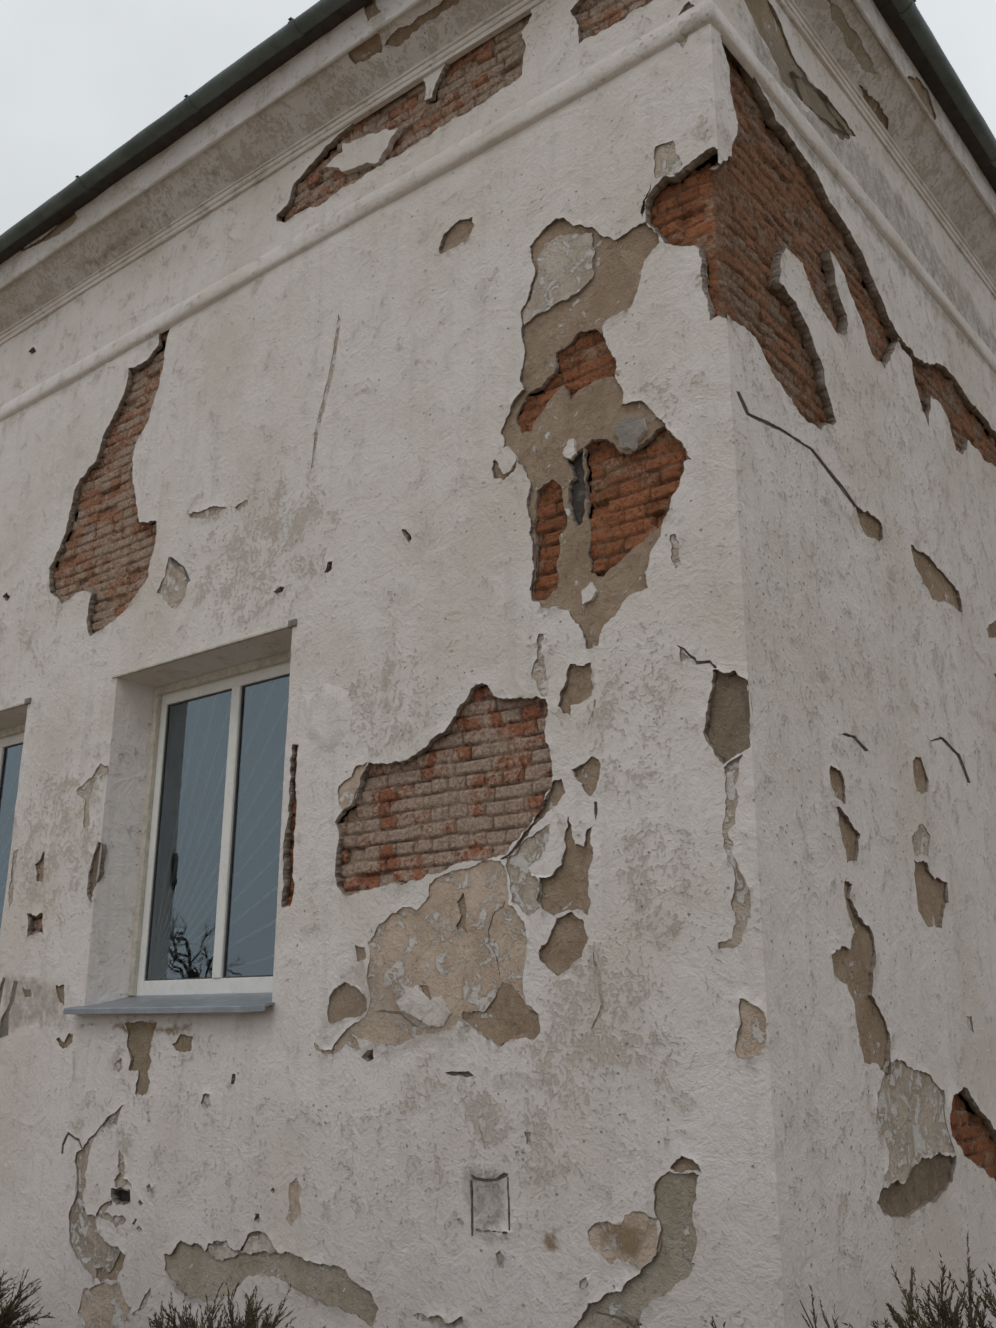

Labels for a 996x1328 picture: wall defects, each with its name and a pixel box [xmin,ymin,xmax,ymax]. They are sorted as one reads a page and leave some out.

spalling [276,13,532,222]
spalling [570,0,653,44]
peeling [744,0,856,140]
spalling [49,329,190,636]
crack [311,314,341,469]
peeling [314,35,996,1062]
crack [736,391,883,542]
spalling [281,744,299,907]
peeling [831,881,996,1219]
peeling [69,1105,151,1328]
peeling [164,1213,378,1326]
peeling [574,1156,702,1328]